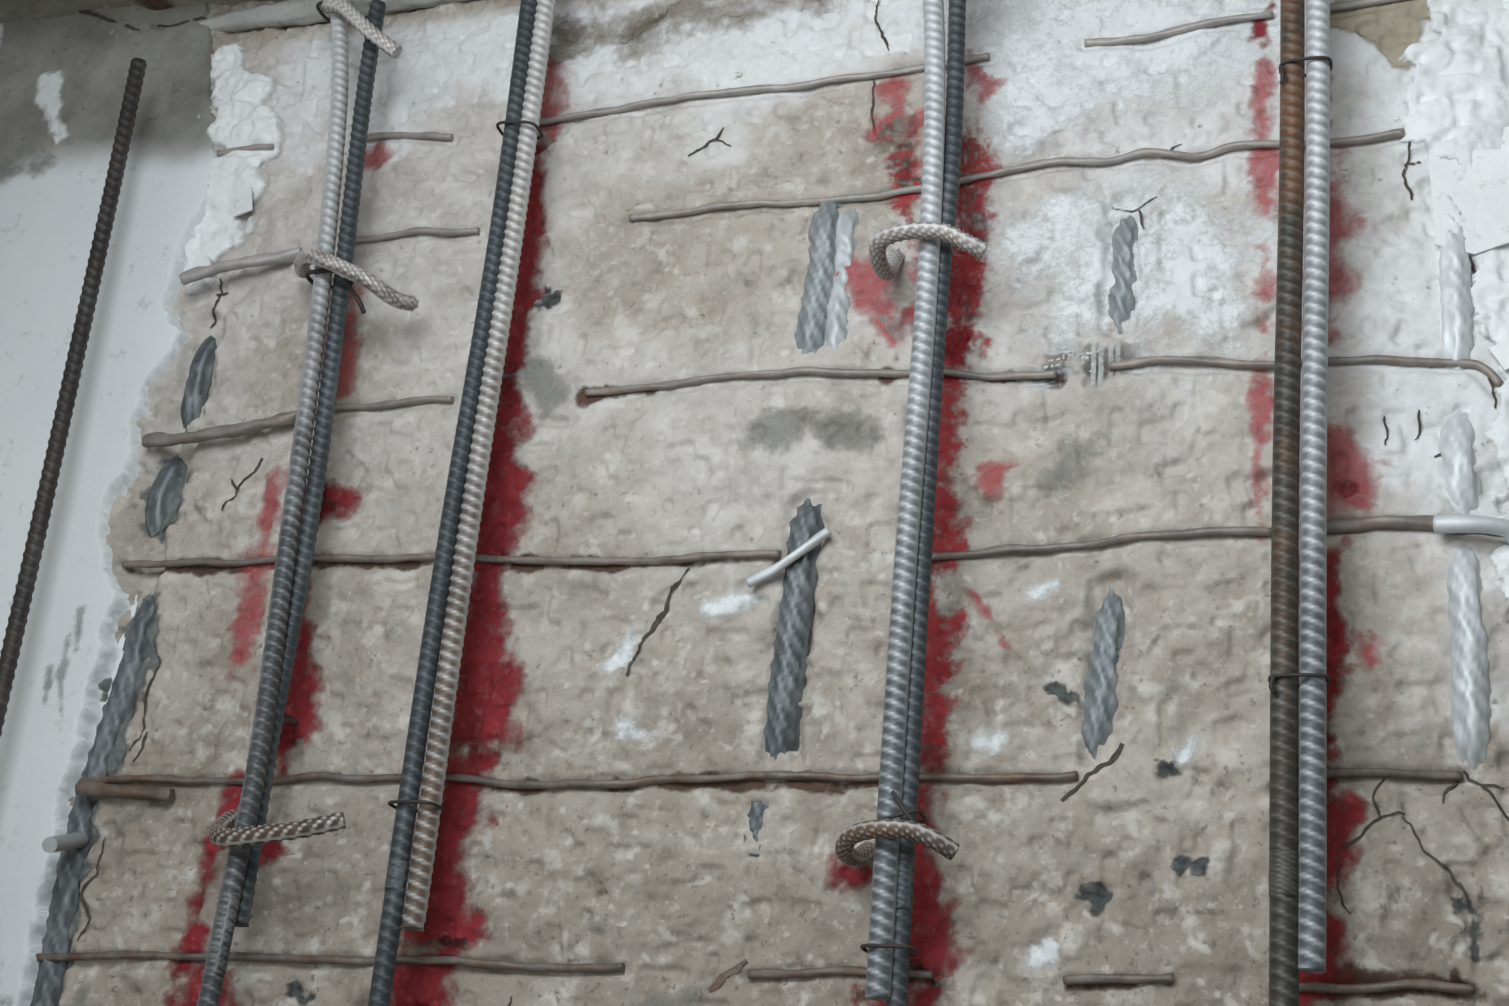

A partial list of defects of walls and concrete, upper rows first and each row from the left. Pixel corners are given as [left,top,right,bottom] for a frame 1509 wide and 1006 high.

spalling [0,58,147,737]
spalling [30,782,374,1006]
spalling [81,261,332,829]
spalling [182,0,537,957]
crack [626,568,690,676]
spalling [368,0,1509,1006]
crack [1336,778,1470,914]
crack [1442,770,1509,821]